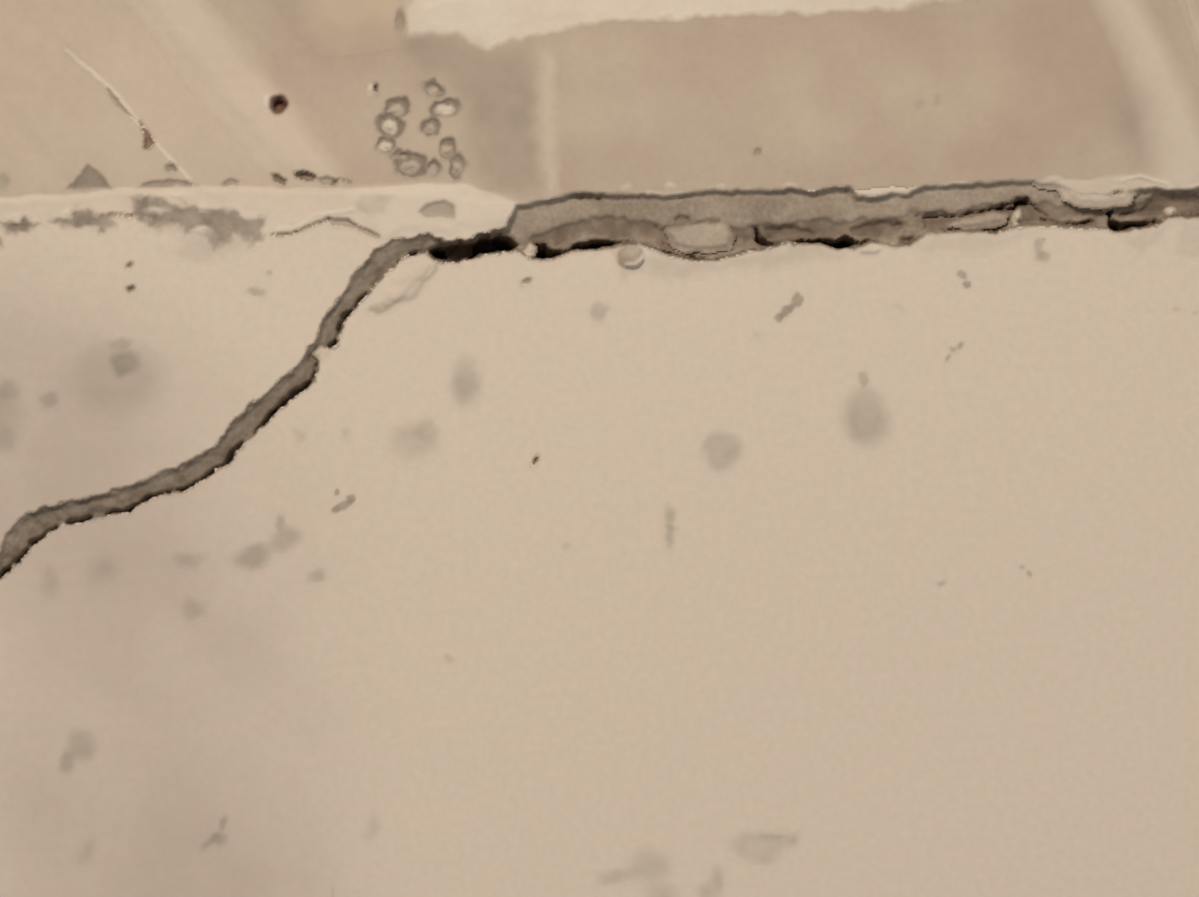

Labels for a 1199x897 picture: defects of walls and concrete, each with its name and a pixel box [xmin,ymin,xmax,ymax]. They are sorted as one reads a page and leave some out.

spalling [136,117,158,151]
peeling [0,161,271,268]
crack [0,193,1199,582]